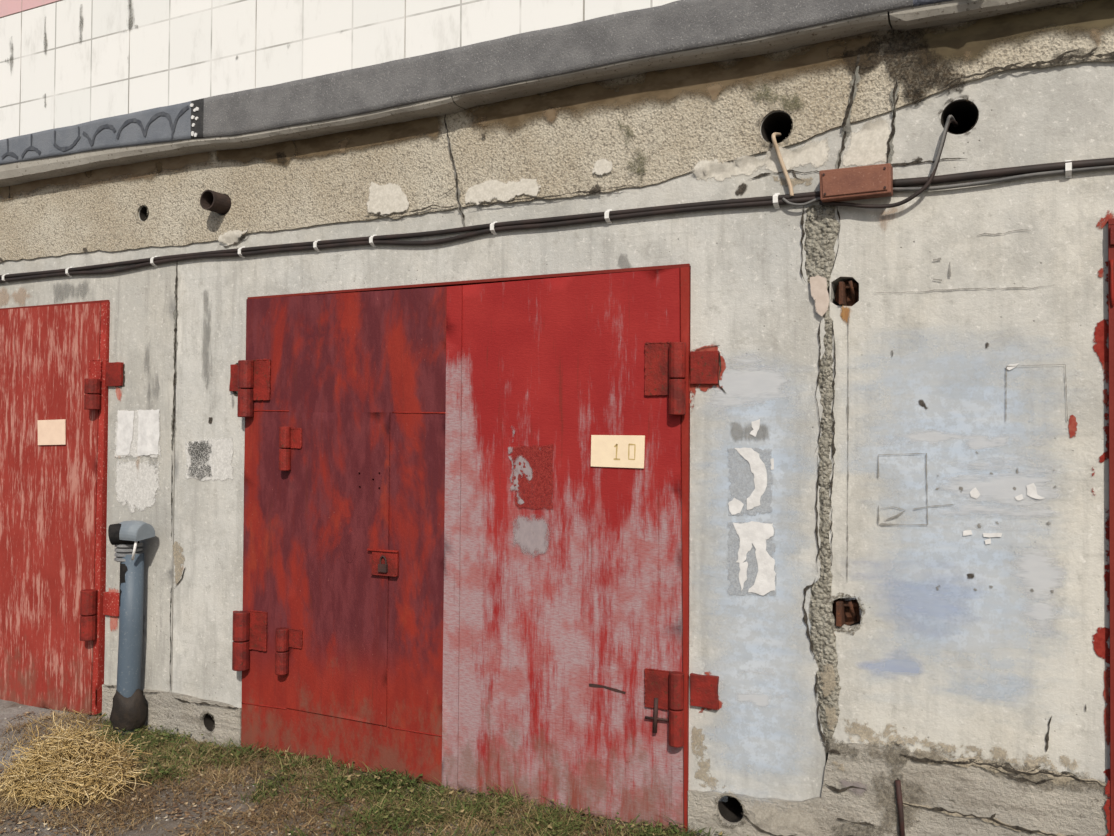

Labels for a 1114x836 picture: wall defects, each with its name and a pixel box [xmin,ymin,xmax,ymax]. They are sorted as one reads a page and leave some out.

peeling [364,182,409,217]
peeling [465,178,541,206]
crack [409,114,638,226]
damp [465,0,1114,130]
crack [751,53,861,181]
crack [886,79,967,166]
crack [938,47,1114,90]
crack [843,316,851,576]
crack [741,813,794,836]
crack [825,784,874,826]
spalling [715,738,1104,836]
crack [886,716,1106,836]